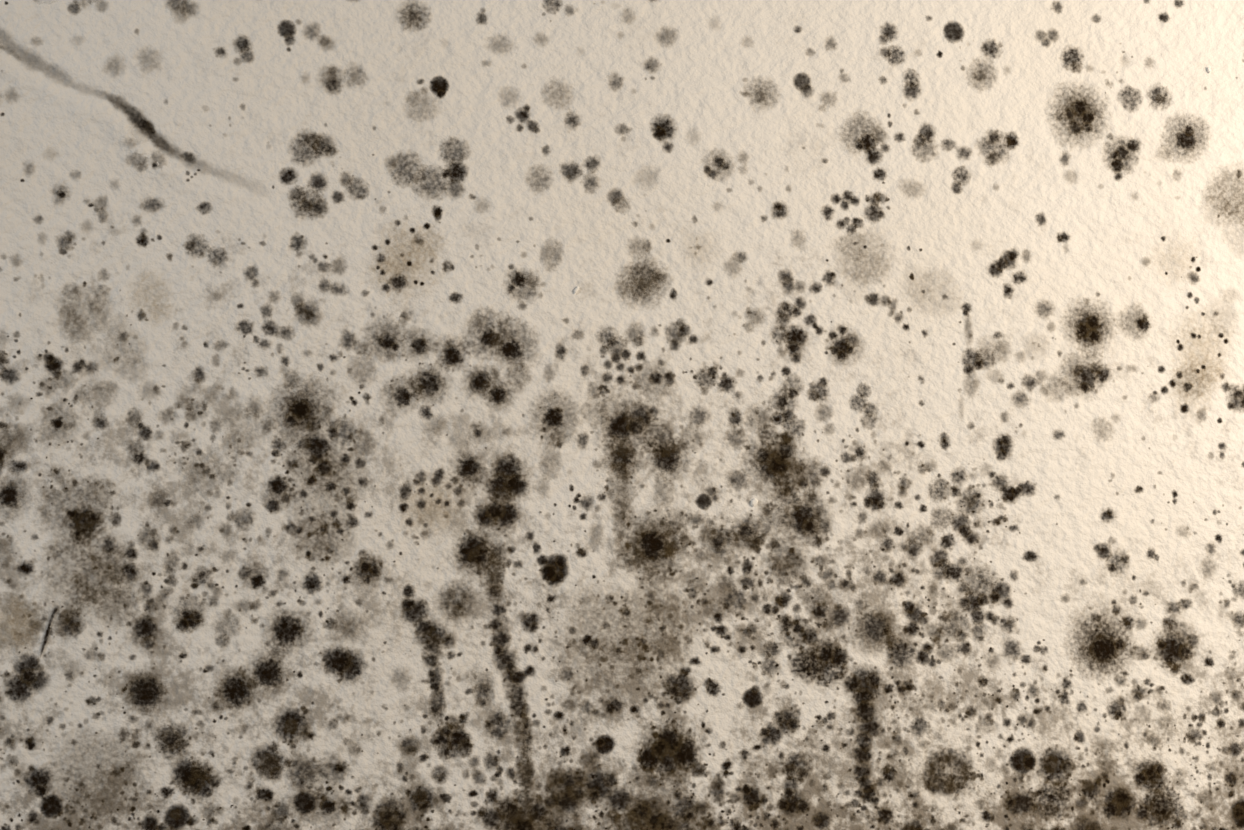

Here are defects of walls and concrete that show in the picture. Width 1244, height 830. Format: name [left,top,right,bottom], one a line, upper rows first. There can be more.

leakage [937,23,963,57]
leakage [418,77,449,98]
crack [131,108,154,136]
leakage [272,135,366,216]
leakage [395,141,475,242]
leakage [652,119,674,152]
leakage [824,114,903,248]
leakage [1106,138,1139,180]
leakage [0,443,121,540]
leakage [94,379,372,648]
leakage [5,647,47,700]
leakage [194,659,303,724]